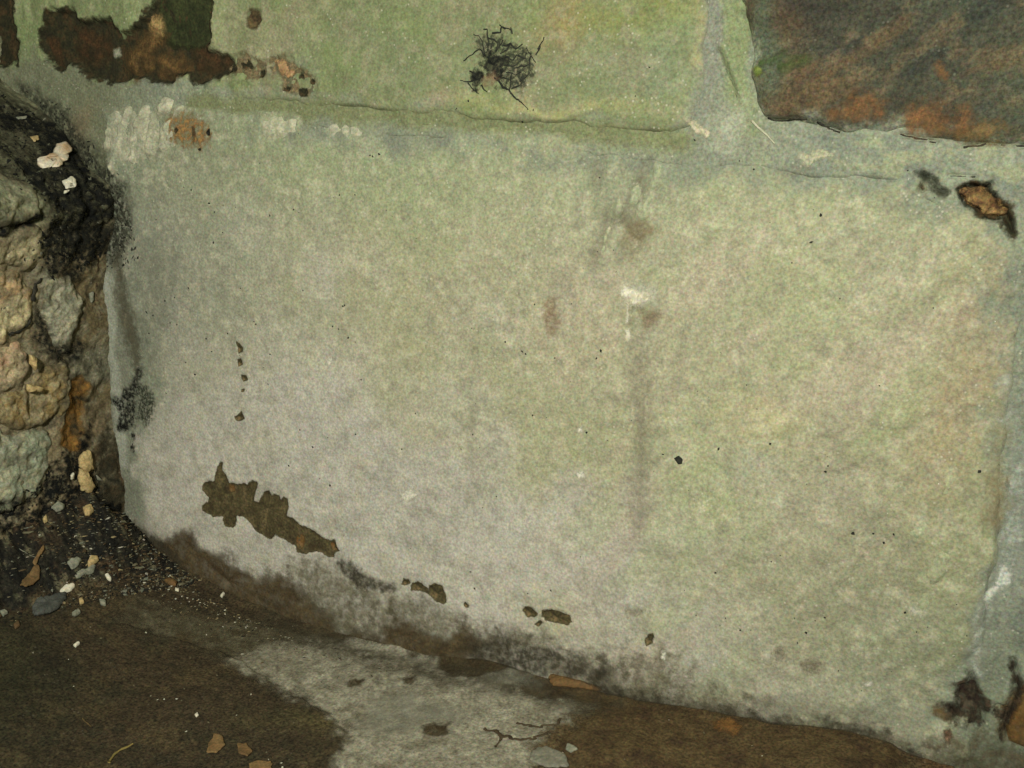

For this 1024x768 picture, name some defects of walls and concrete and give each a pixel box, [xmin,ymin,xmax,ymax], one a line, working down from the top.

spalling [38,0,316,96]
spalling [166,112,212,151]
spalling [918,170,1017,238]
peeling [236,342,247,392]
peeling [202,461,340,557]
peeling [401,578,446,604]
peeling [522,606,572,627]
leakage [127,529,1024,768]
spalling [933,676,991,742]